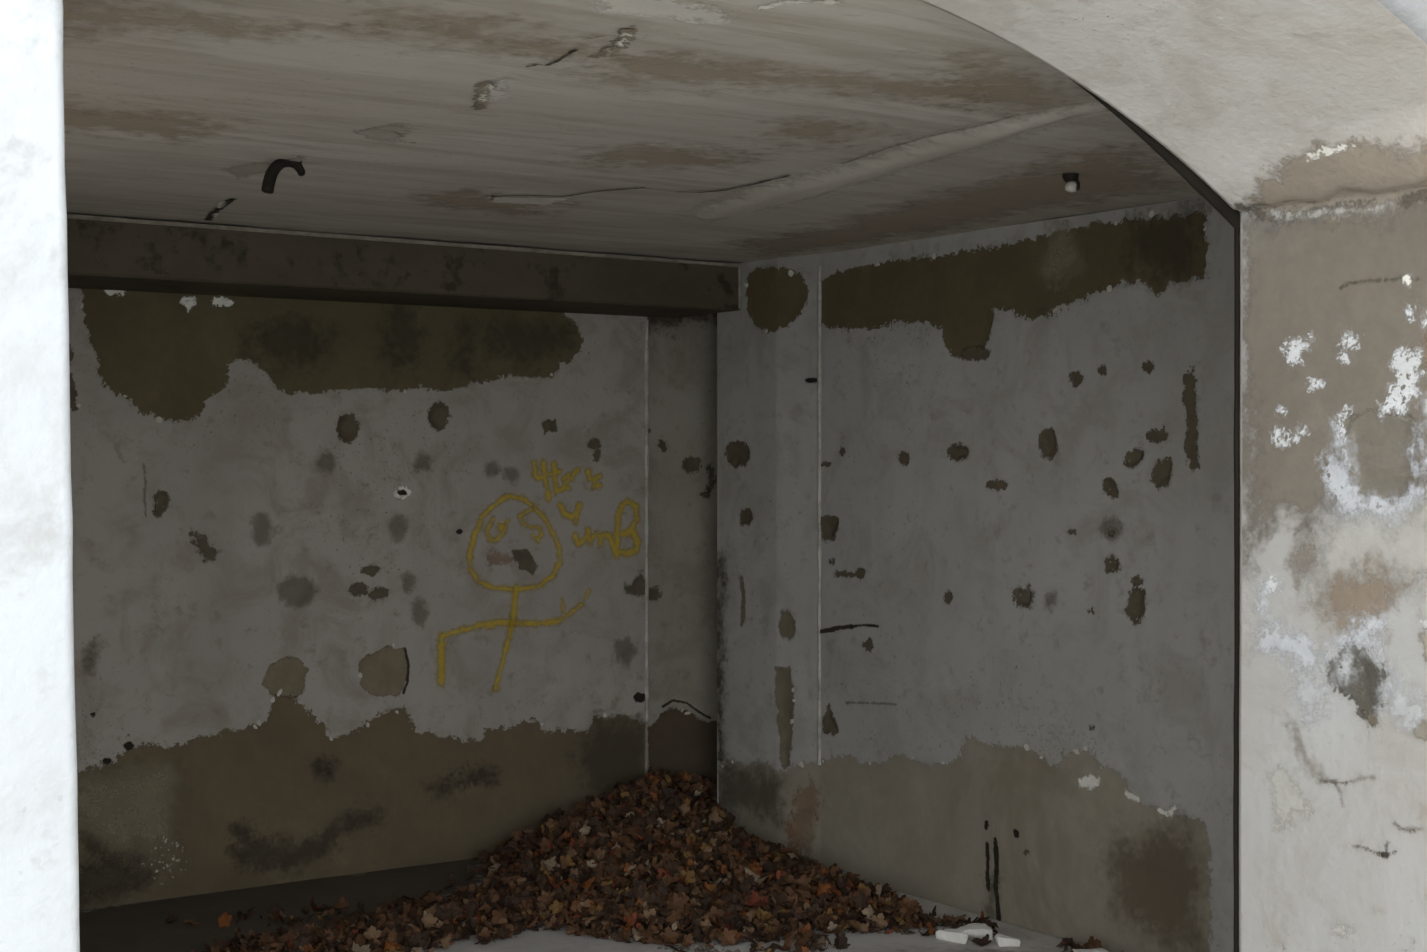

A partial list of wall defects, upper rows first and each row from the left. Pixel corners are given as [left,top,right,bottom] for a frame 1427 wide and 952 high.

spalling [69,344,81,411]
peeling [80,289,584,432]
peeling [744,210,1209,363]
damp [1279,333,1326,393]
peeling [1242,137,1427,564]
damp [1337,332,1361,364]
damp [1378,346,1427,421]
damp [1254,404,1427,749]
spalling [1325,642,1389,728]
damp [78,760,488,952]
peeling [77,643,1213,952]
crack [1356,823,1415,858]